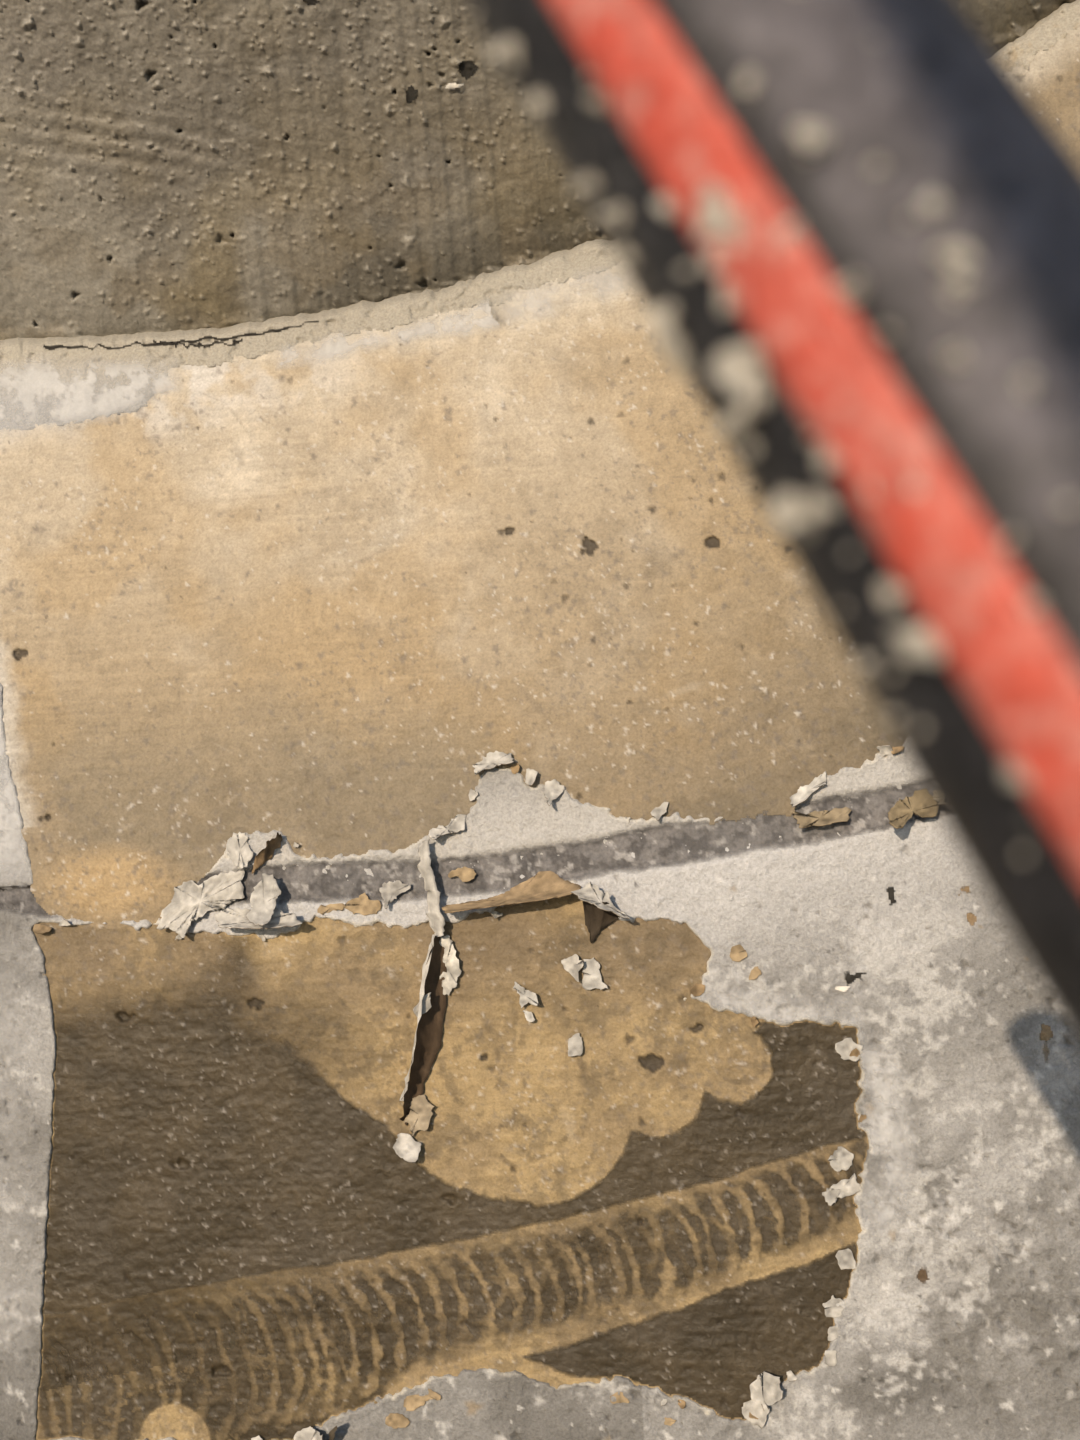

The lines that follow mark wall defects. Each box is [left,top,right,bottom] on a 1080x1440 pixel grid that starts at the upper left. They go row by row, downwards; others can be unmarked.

peeling [1011,26,1080,164]
peeling [0,264,903,1440]
peeling [888,789,938,829]